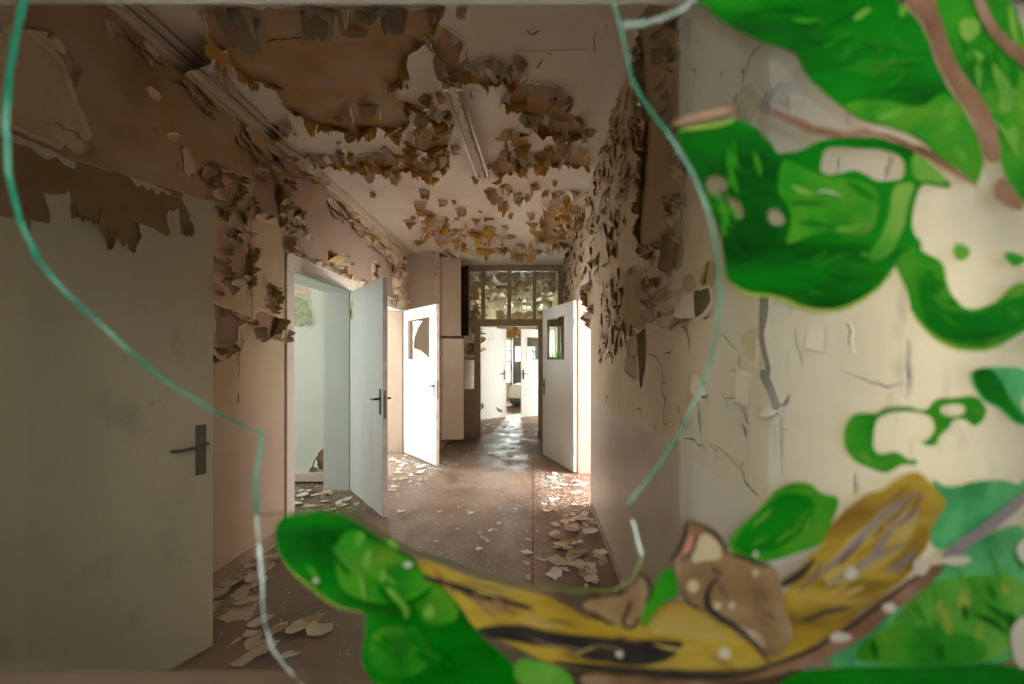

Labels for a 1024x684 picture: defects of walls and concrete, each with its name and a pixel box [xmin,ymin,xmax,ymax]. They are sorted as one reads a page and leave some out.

peeling [0,4,716,390]
crack [636,312,757,495]